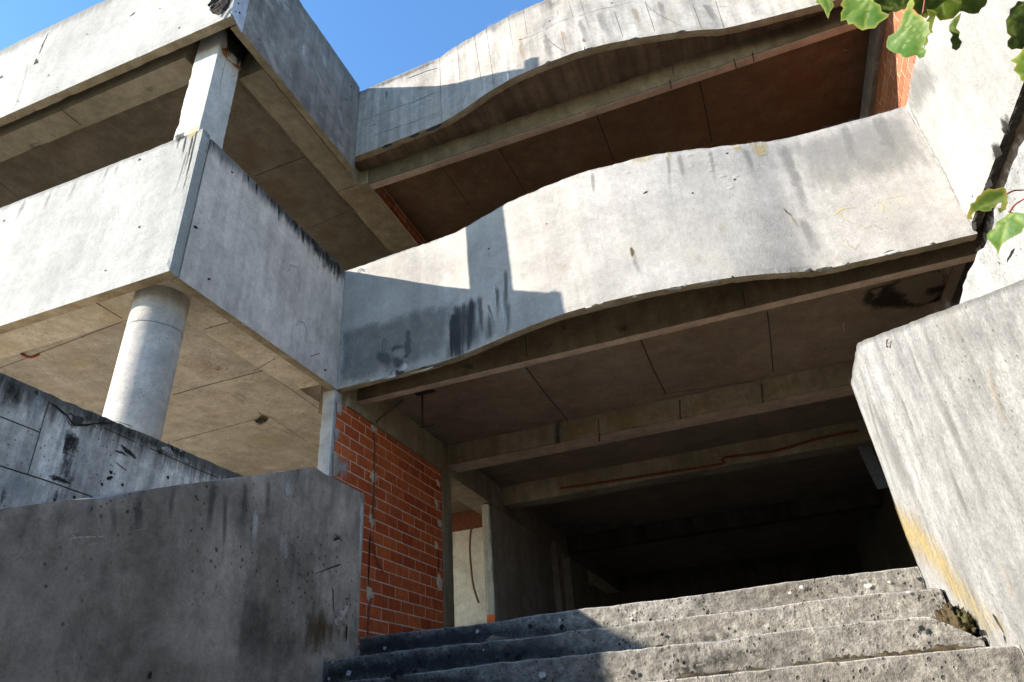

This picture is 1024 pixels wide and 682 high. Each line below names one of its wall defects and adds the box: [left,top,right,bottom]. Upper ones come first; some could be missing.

damp [175,131,214,190]
damp [247,175,343,282]
damp [450,277,507,357]
damp [863,270,946,308]
crack [37,388,132,429]